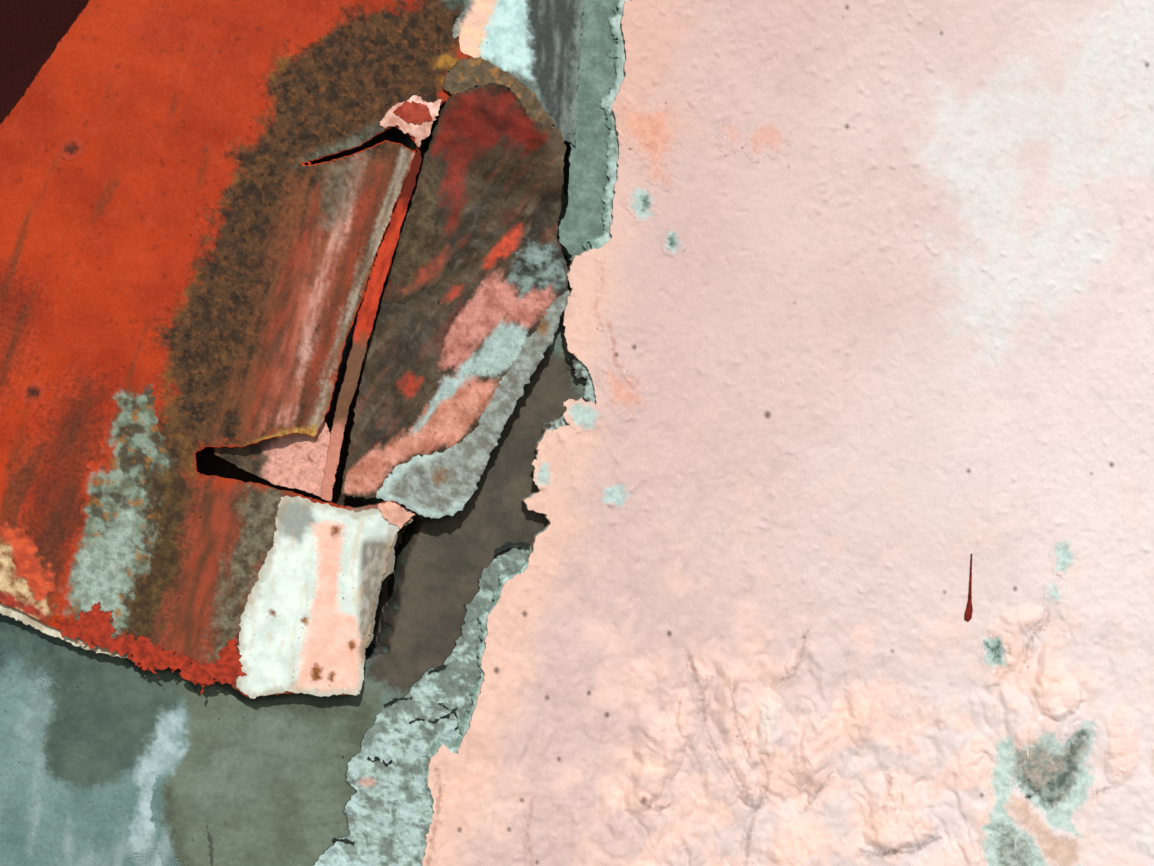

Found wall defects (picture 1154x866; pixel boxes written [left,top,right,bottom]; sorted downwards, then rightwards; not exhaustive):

rust [0,254,124,604]
rust [110,0,470,666]
leakage [0,343,588,866]
rust [307,661,339,687]
peeling [0,0,659,699]
peeling [660,226,688,257]